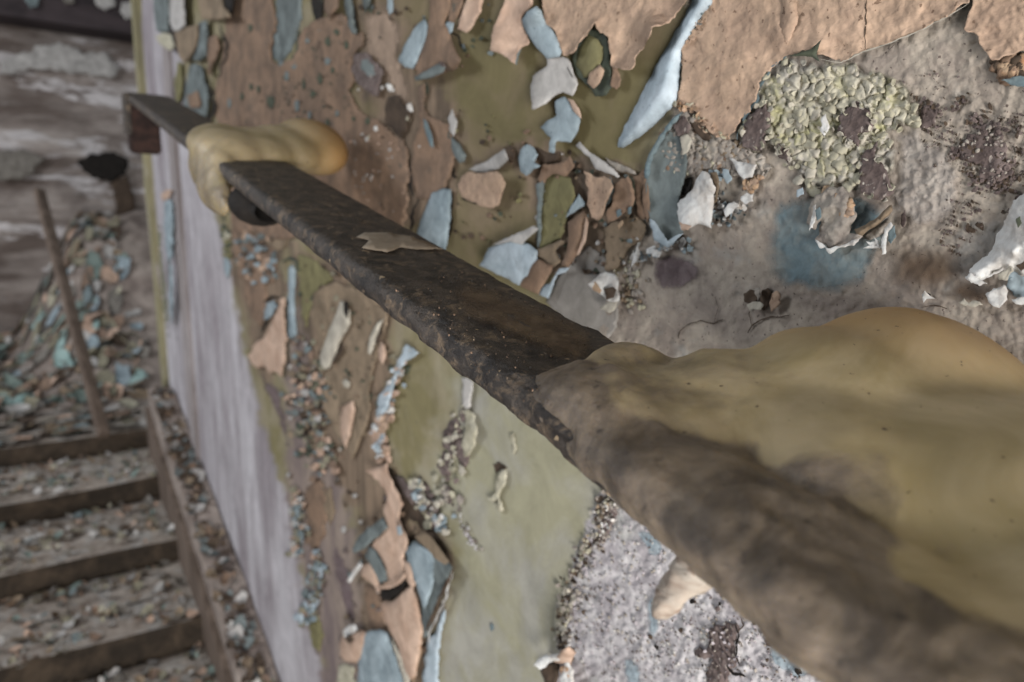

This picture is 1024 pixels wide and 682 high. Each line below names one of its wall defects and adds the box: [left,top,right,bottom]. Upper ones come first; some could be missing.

peeling [153,0,1024,338]
peeling [219,211,478,682]